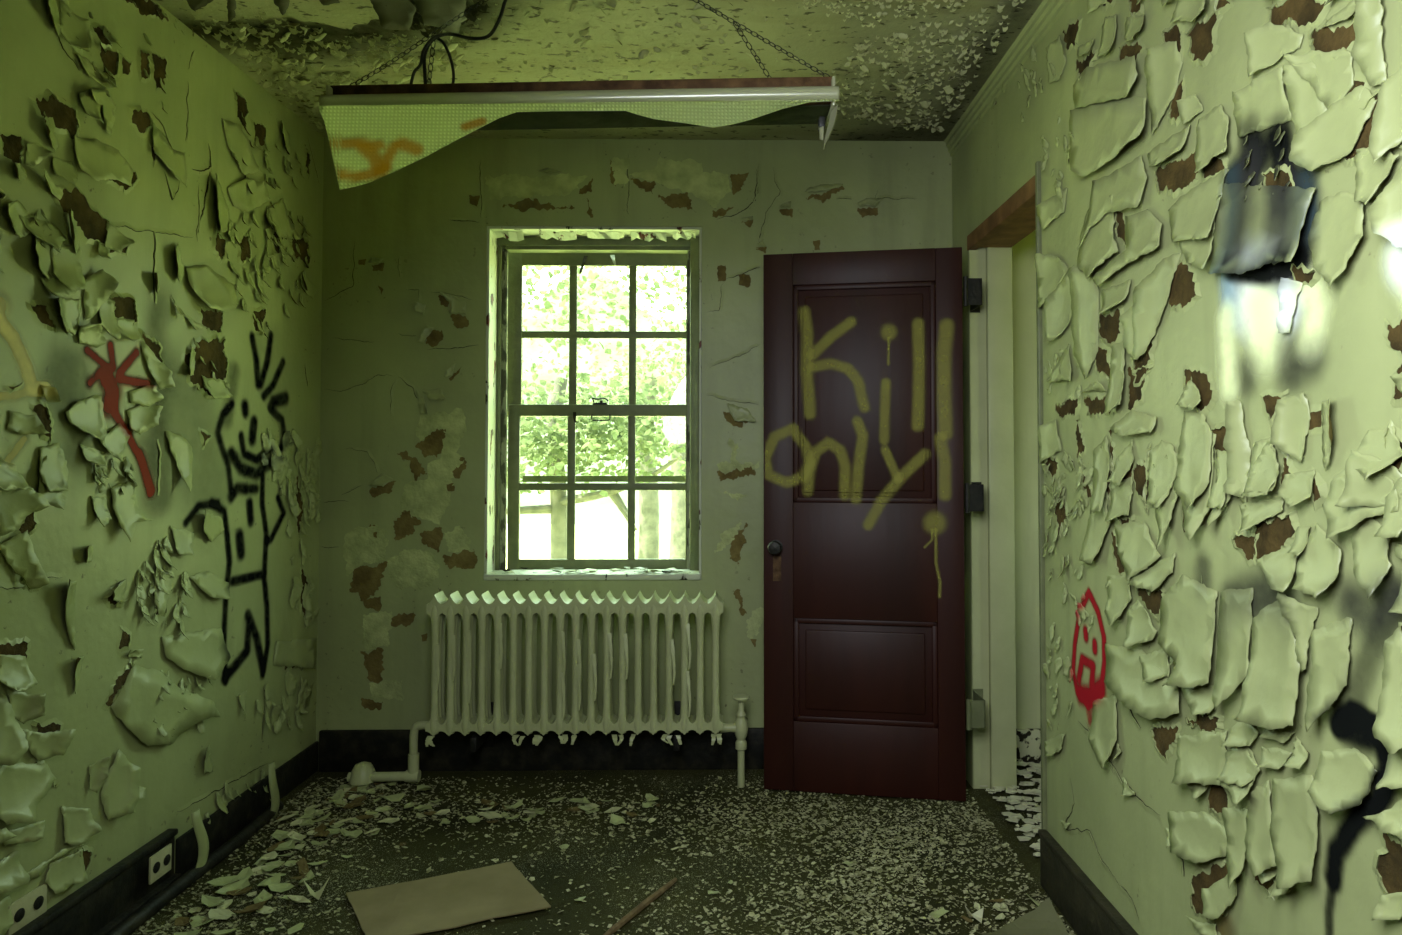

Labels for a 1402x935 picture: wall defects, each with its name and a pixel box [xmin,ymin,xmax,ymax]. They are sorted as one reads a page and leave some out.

peeling [102,508,280,880]
peeling [0,0,1026,710]
peeling [991,0,1402,935]